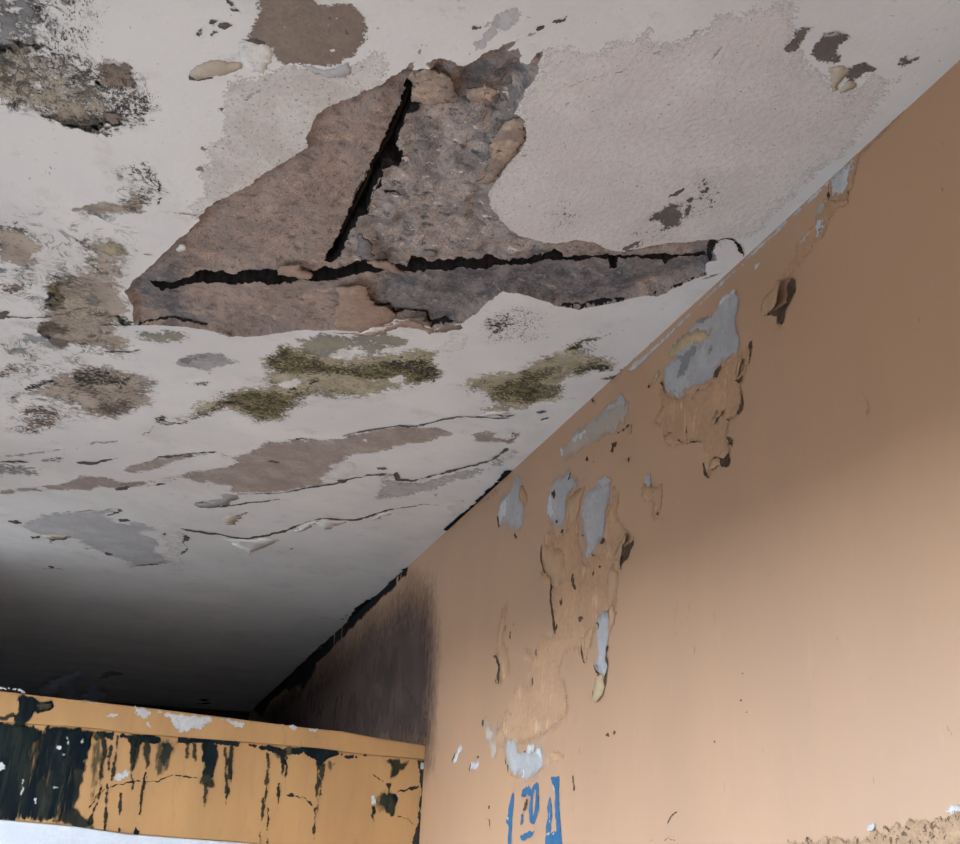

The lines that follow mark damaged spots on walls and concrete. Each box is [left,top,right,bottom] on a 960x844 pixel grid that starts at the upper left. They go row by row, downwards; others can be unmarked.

crack [150,45,744,296]
spalling [124,0,919,337]
water stain [0,220,189,434]
crack [0,307,208,349]
water stain [143,331,467,435]
crack [561,297,625,310]
peeling [0,423,452,494]
crack [181,448,509,555]
water stain [254,568,434,745]
peeling [469,394,634,782]
water stain [0,694,367,843]
spalling [787,804,960,844]